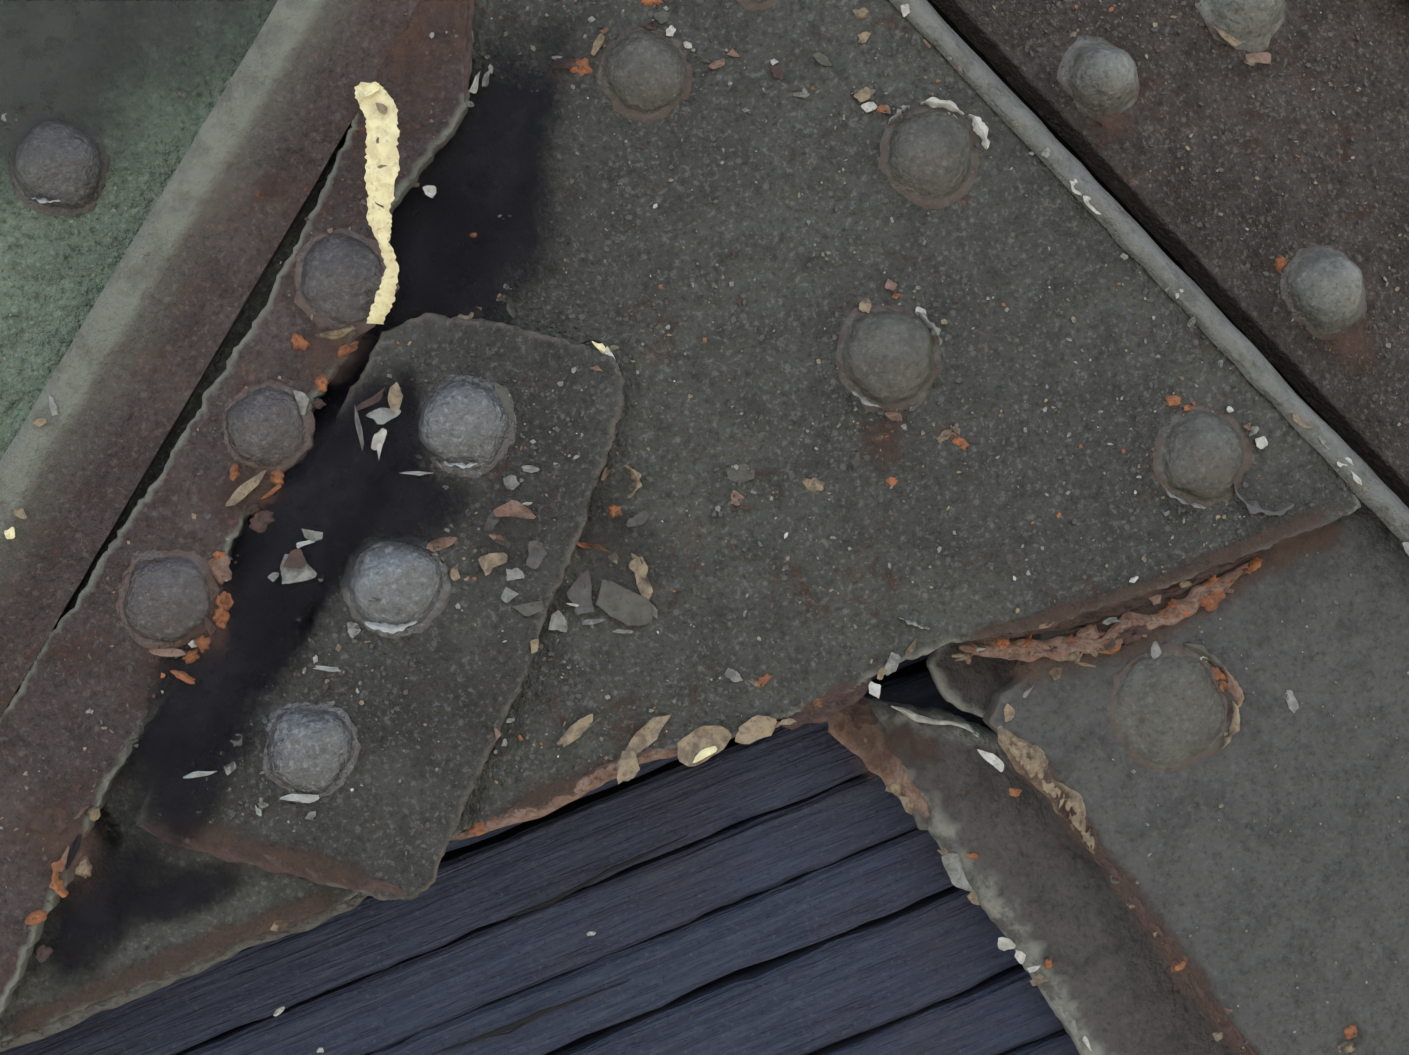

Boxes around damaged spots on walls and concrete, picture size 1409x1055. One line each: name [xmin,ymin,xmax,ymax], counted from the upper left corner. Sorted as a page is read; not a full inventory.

rust [291,327,359,415]
rust [225,463,284,533]
rust [149,551,234,684]
rust [952,510,1337,680]
rust [778,678,935,818]